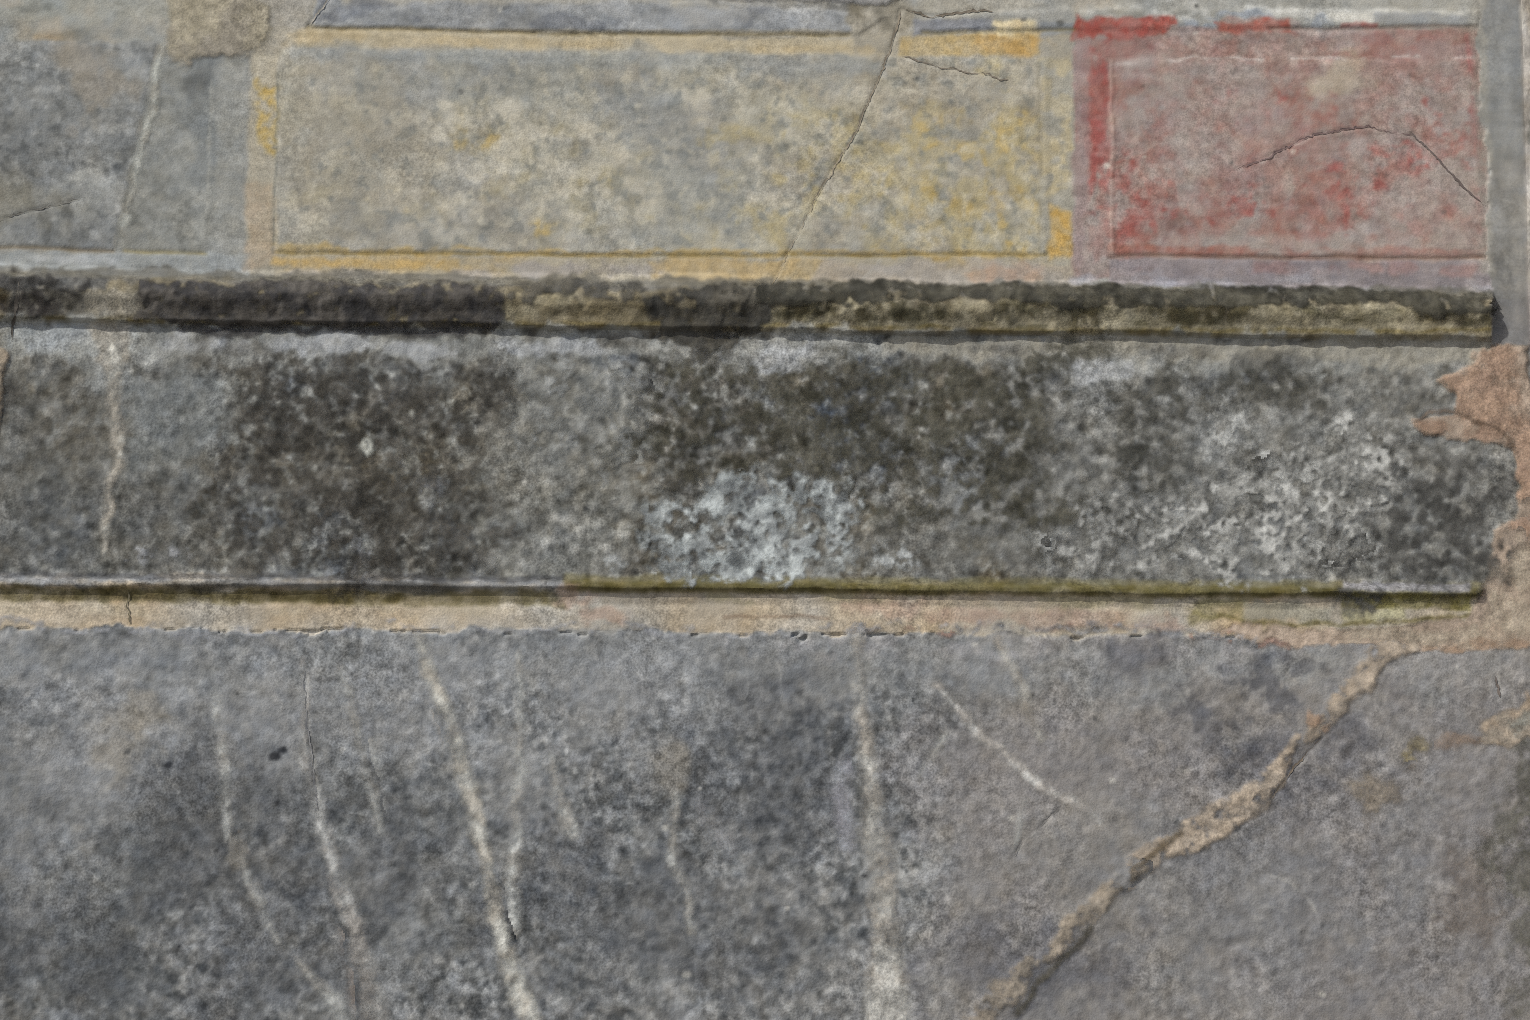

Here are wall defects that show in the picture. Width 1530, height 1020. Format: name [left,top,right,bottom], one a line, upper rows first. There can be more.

crack [772,8,1008,284]
crack [1236,124,1486,206]
crack [0,281,19,416]
spalling [1175,344,1530,653]
crack [971,626,1419,1020]